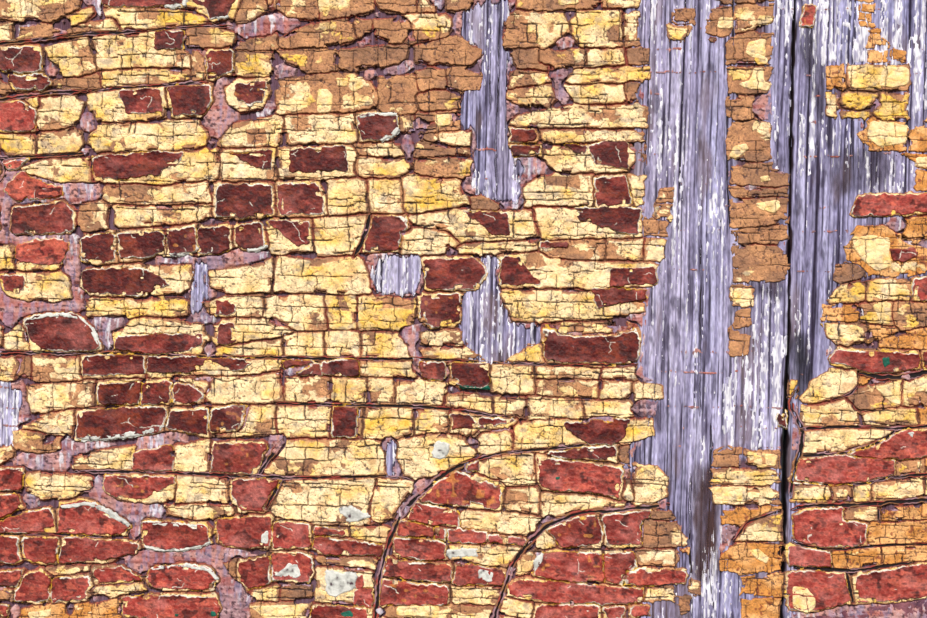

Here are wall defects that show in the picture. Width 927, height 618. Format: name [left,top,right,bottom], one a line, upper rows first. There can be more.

crack [0,24,233,46]
peeling [0,99,39,134]
crack [0,151,86,182]
crack [0,349,637,368]
peeling [0,126,692,618]
crack [832,369,927,401]
crack [276,401,516,419]
crack [491,240,717,618]
crack [733,386,927,541]
crack [72,438,600,618]
peeling [687,577,702,596]
crack [789,539,927,602]